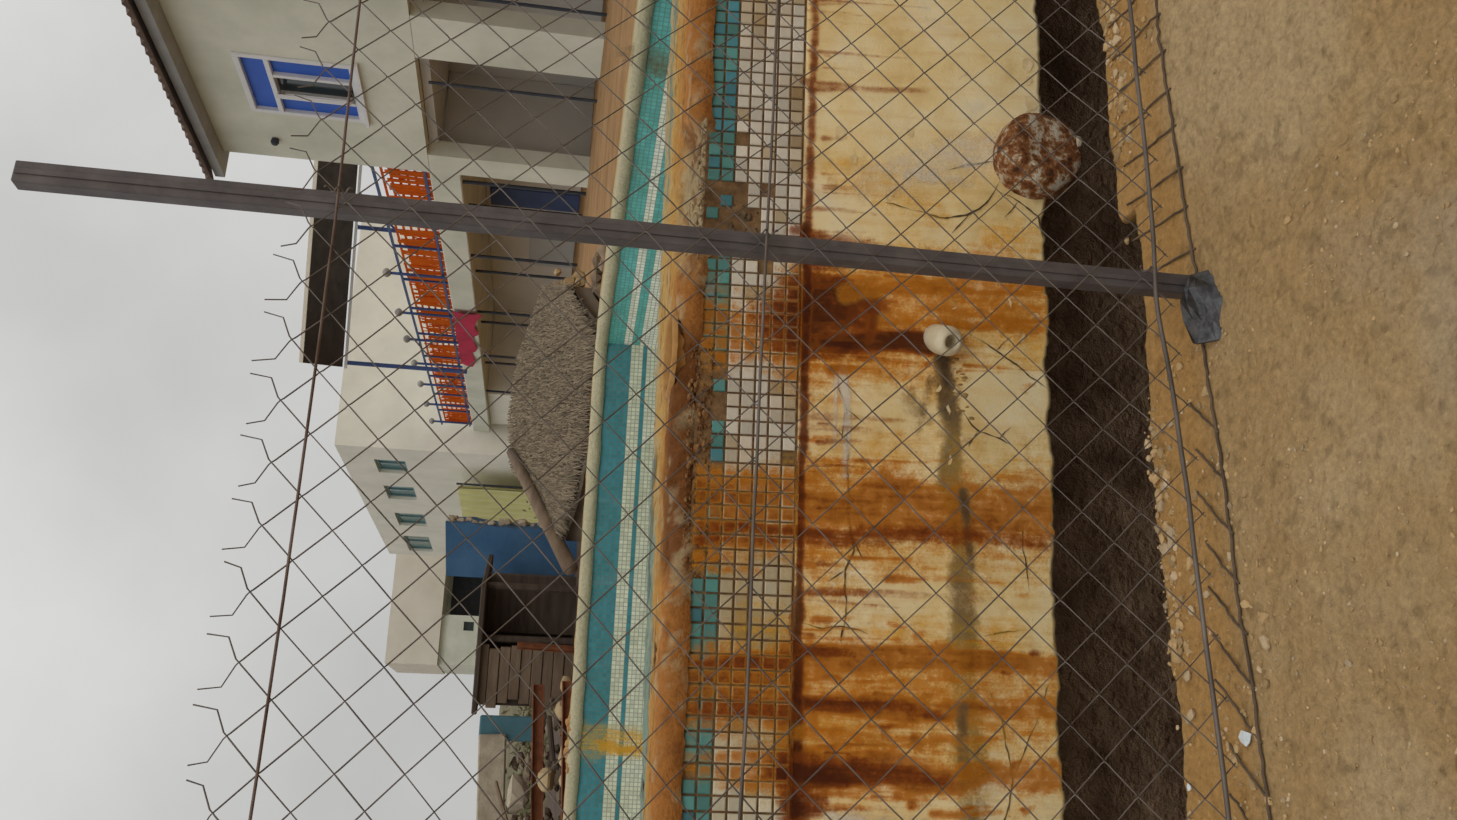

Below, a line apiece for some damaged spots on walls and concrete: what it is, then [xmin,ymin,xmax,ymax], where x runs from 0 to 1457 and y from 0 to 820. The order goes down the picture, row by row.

spalling [690,118,708,227]
rust [789,0,919,244]
spalling [681,332,715,578]
rust [684,264,1061,820]
rust [580,725,643,758]